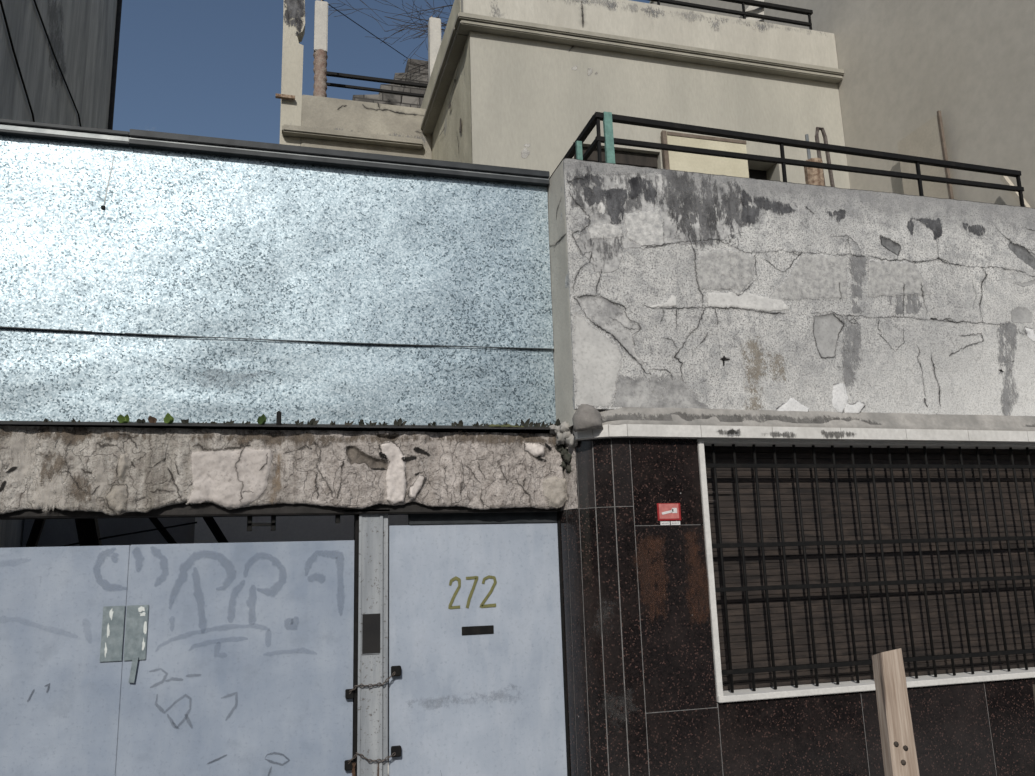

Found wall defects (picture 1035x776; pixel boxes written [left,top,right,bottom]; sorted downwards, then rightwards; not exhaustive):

leakage [284,0,306,36]
crack [549,178,820,382]
peeling [571,172,848,311]
spalling [1009,241,1035,287]
leakage [841,254,869,387]
crack [812,228,1035,415]
leakage [997,321,1027,416]
crack [65,441,100,494]
crack [96,433,344,502]
peeling [186,447,273,507]
peeling [346,434,430,504]
peeling [524,442,552,461]